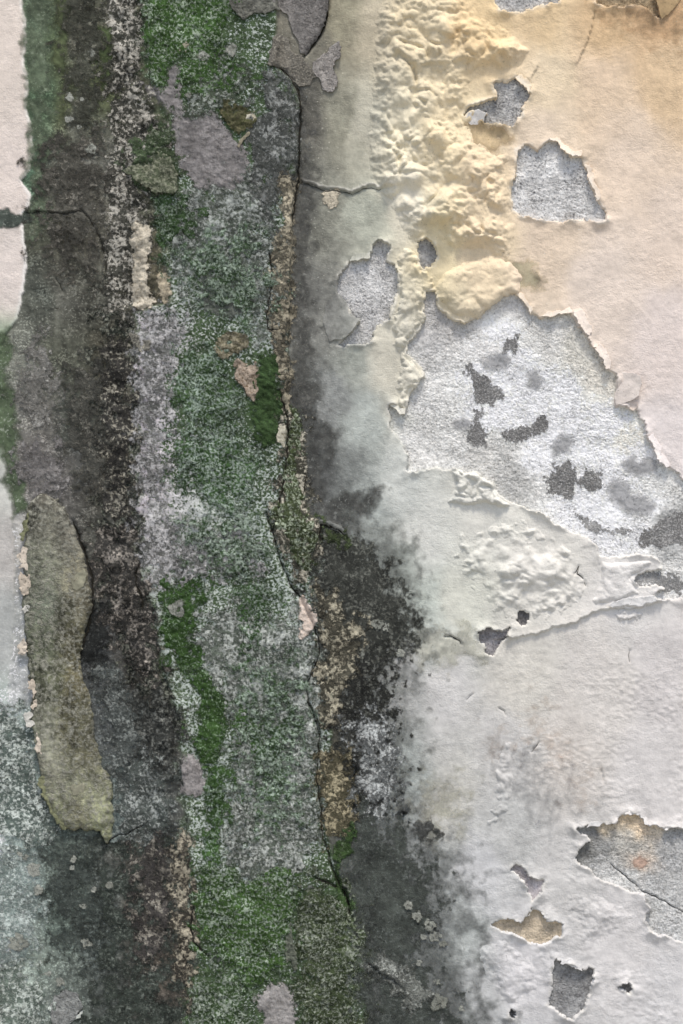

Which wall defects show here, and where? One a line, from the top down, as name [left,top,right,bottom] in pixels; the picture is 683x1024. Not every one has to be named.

crack [281,1,381,221]
peeling [511,137,606,223]
crack [266,253,279,330]
crack [266,396,307,597]
crack [319,524,347,541]
water stain [280,89,494,1024]
peeling [388,292,683,609]
peeling [478,611,529,656]
crack [307,628,350,917]
peeling [491,864,563,944]
peeling [576,811,683,941]
peeling [549,956,593,1019]